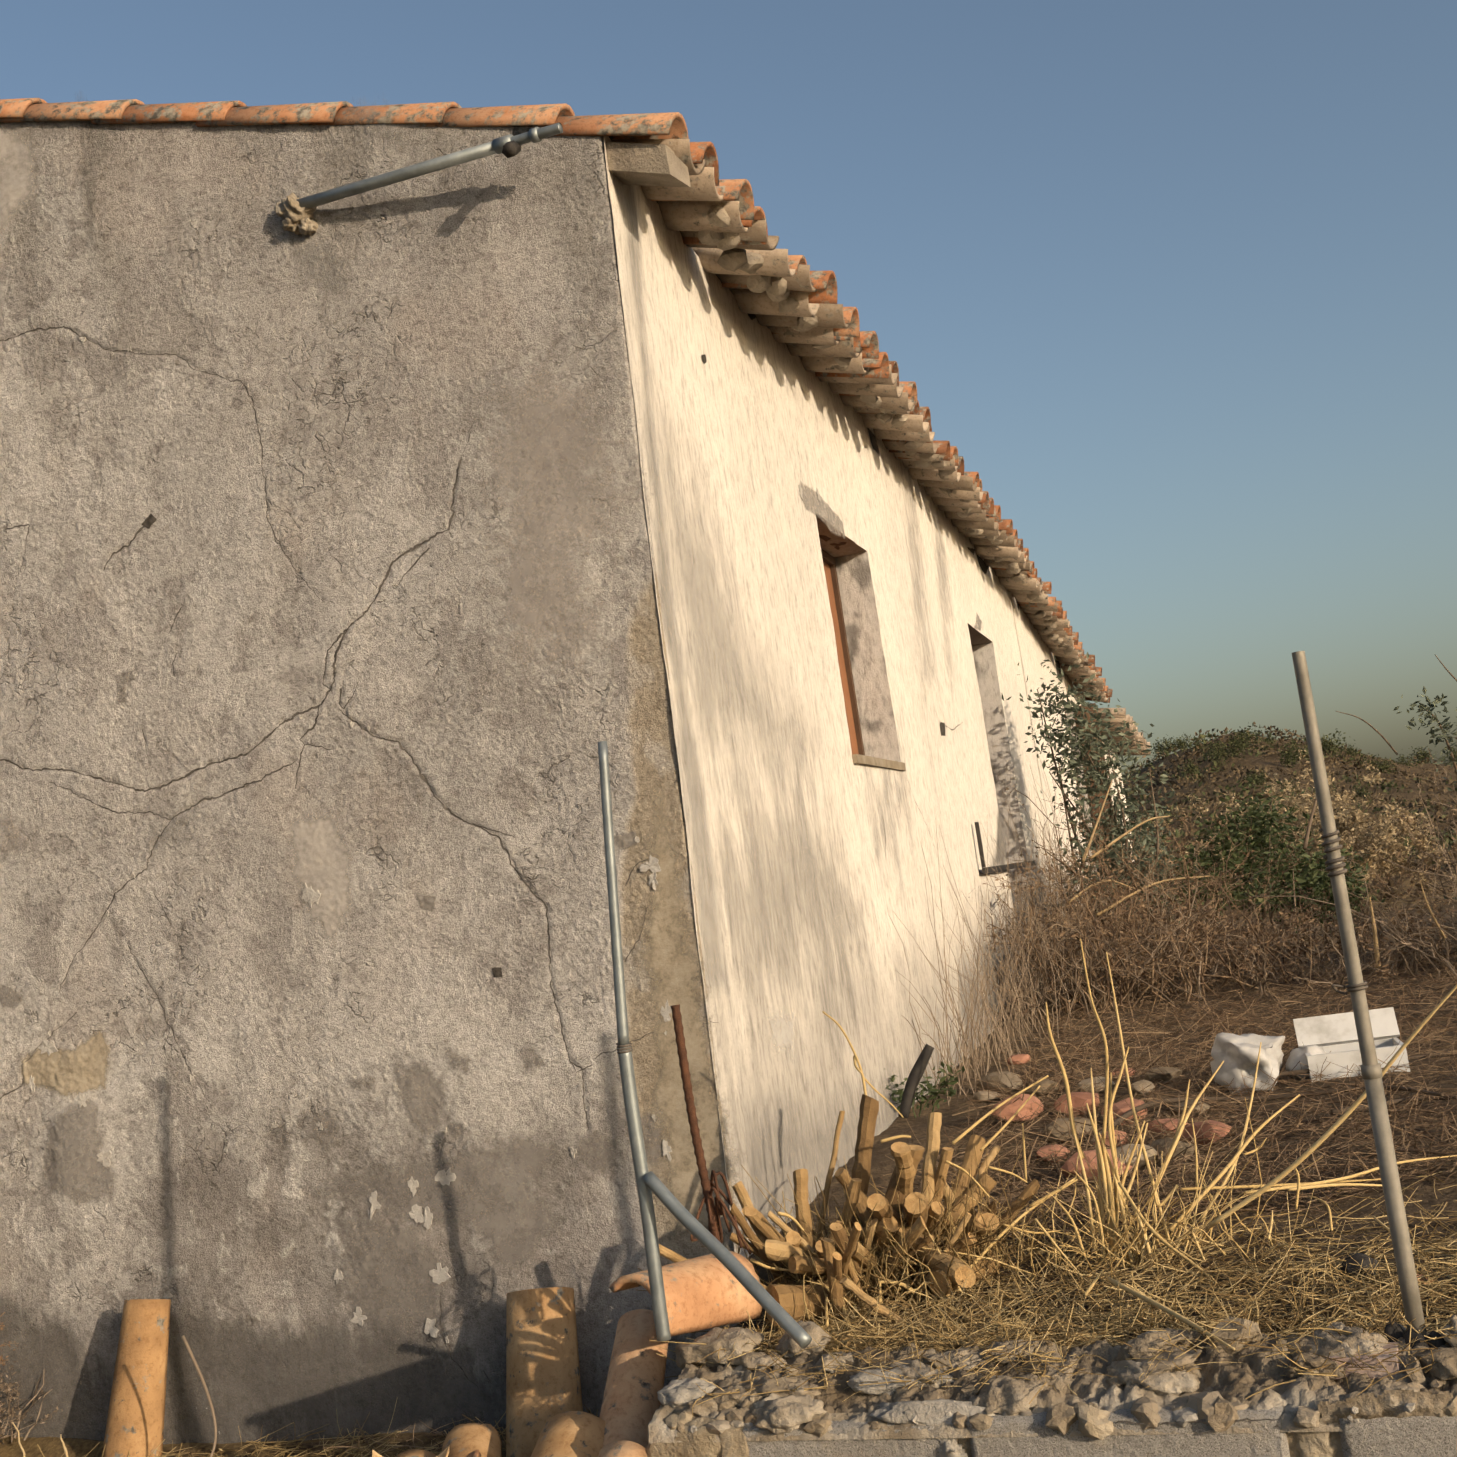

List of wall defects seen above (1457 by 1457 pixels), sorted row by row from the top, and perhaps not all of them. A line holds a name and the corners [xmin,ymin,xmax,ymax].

crack [0,326,718,1129]
leakage [993,811,1007,866]
flaking render [22,1031,114,1202]